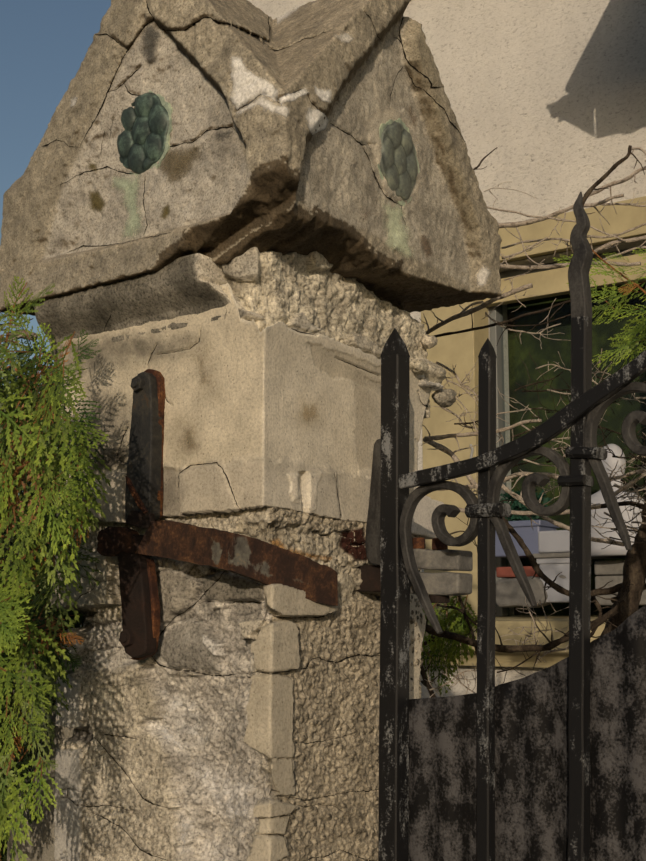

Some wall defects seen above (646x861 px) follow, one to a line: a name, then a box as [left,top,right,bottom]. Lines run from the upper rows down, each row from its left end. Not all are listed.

crack [41,1,333,253]
crack [170,89,406,225]
crack [365,12,464,140]
spalling [157,155,443,418]
rust [130,559,161,660]
crack [159,571,333,636]
crack [151,654,380,676]
spalling [236,519,381,605]
crack [61,734,182,860]
crack [257,789,379,861]